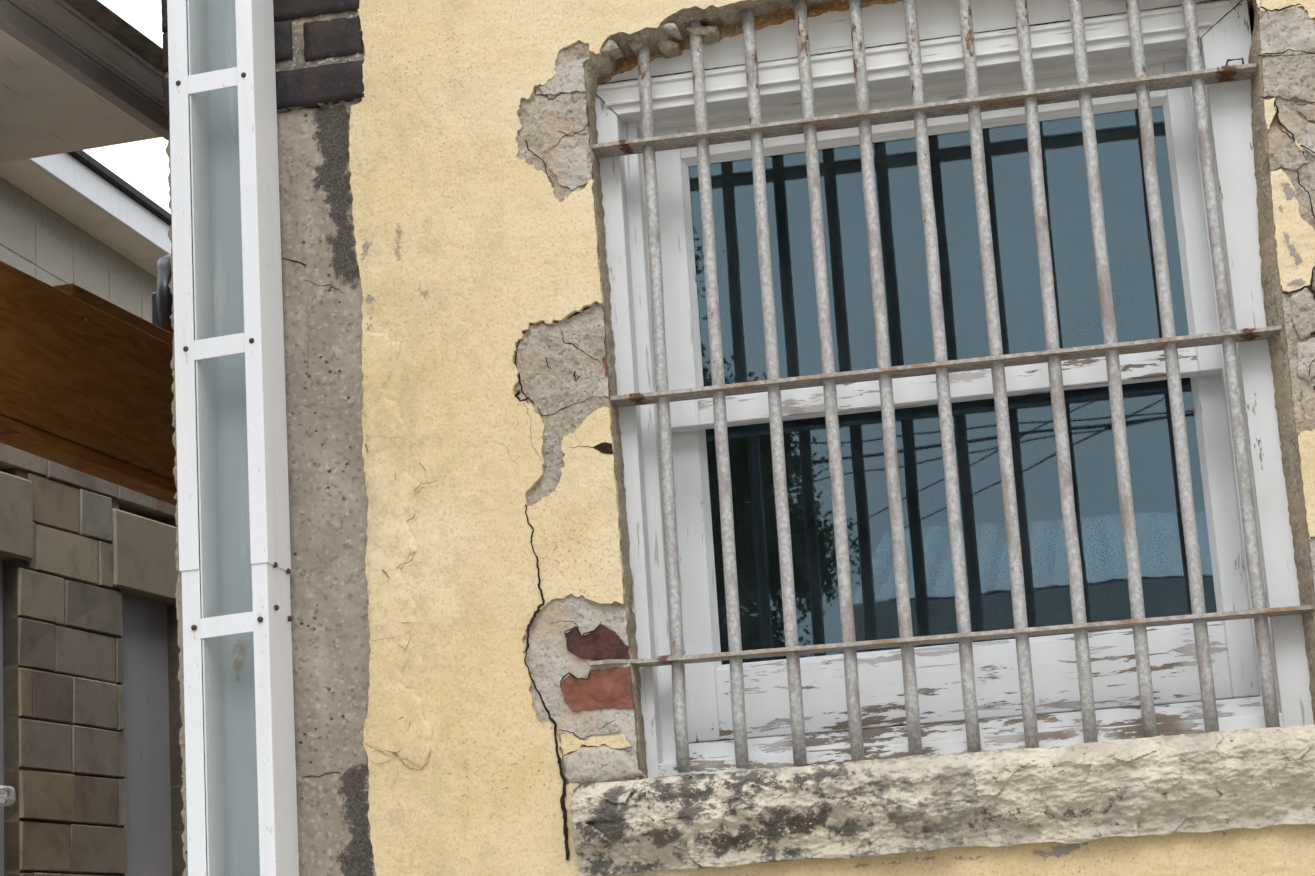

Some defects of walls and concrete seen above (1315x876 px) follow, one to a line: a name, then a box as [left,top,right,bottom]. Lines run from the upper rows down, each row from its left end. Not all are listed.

spalling [516,23,721,202]
spalling [1257,0,1315,435]
spalling [514,303,611,506]
crack [524,504,570,860]
spalling [523,594,647,785]